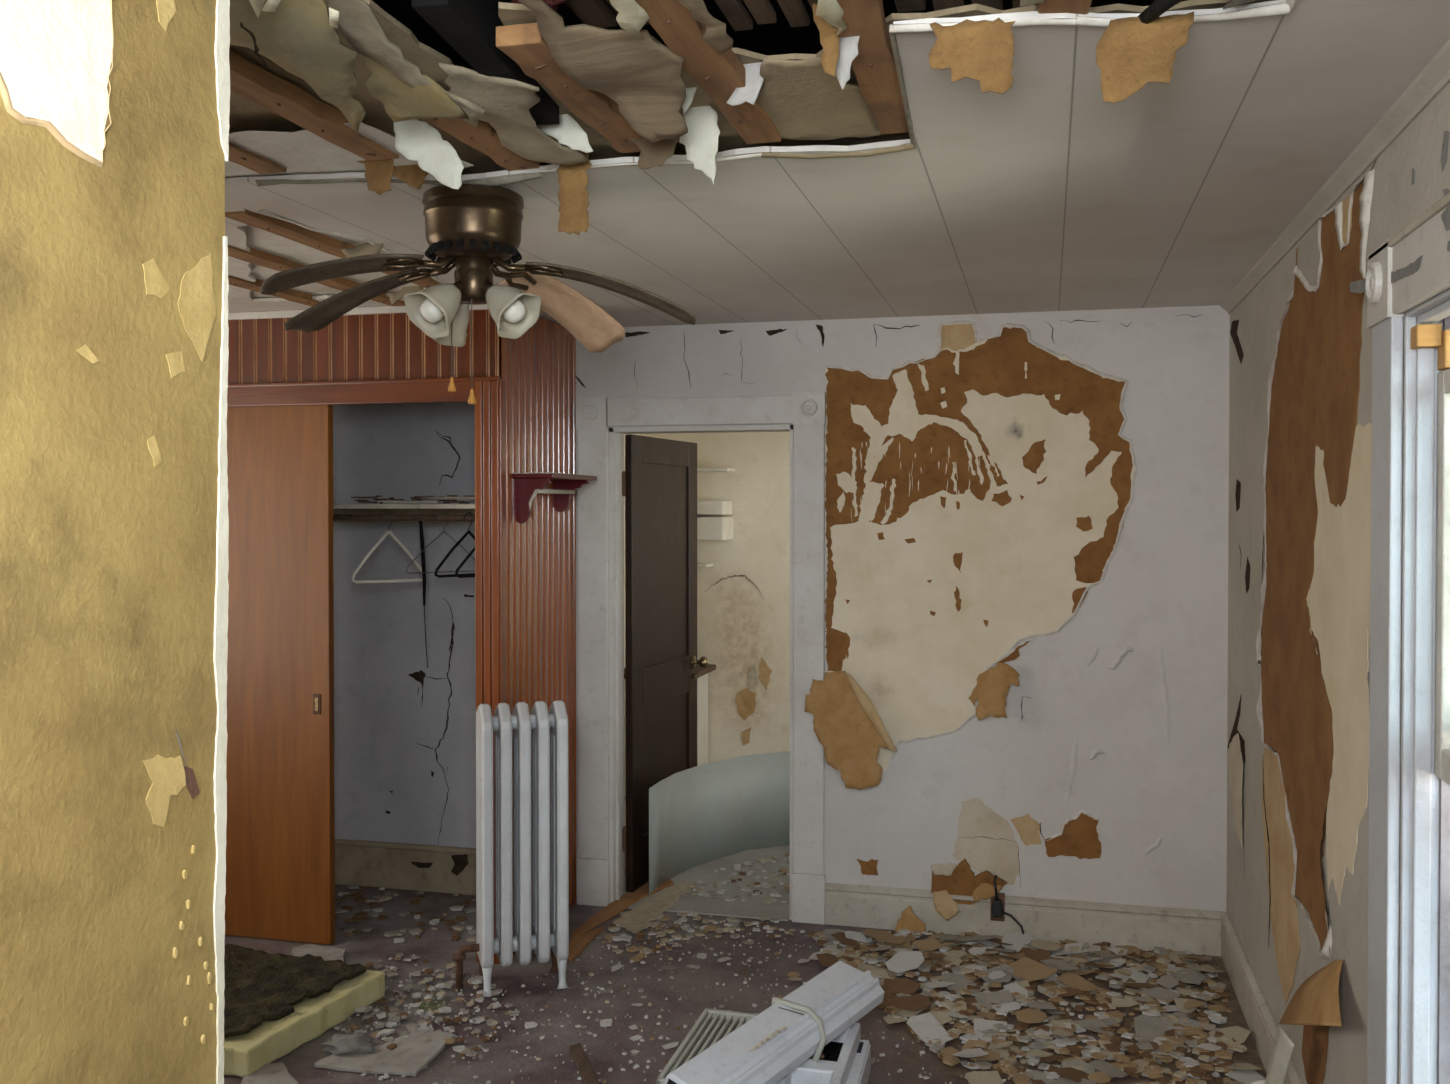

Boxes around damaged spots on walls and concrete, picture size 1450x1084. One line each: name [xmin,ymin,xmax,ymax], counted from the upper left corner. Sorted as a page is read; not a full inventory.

peeling [0,0,115,168]
peeling [214,0,366,178]
peeling [344,122,430,174]
peeling [242,225,419,298]
crack [435,430,461,486]
spalling [142,236,229,1084]
crack [411,594,474,875]
peeling [804,671,898,790]
peeling [969,662,1020,720]
flaking render [1306,422,1372,906]
peeling [1039,810,1102,859]
peeling [894,858,1007,935]